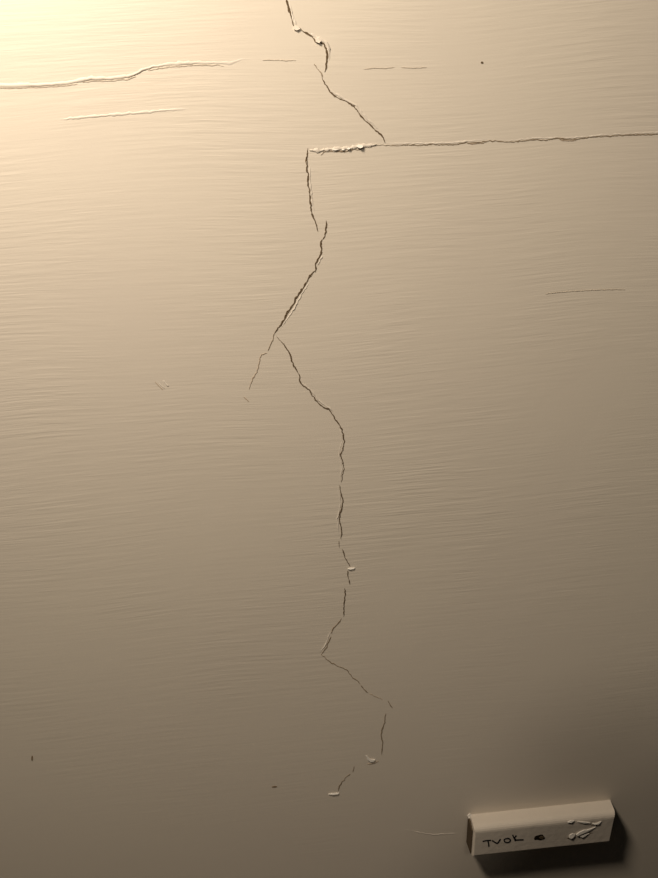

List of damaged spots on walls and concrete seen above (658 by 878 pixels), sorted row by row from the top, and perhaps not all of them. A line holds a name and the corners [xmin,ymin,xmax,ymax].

crack [286,0,658,146]
crack [244,149,392,755]